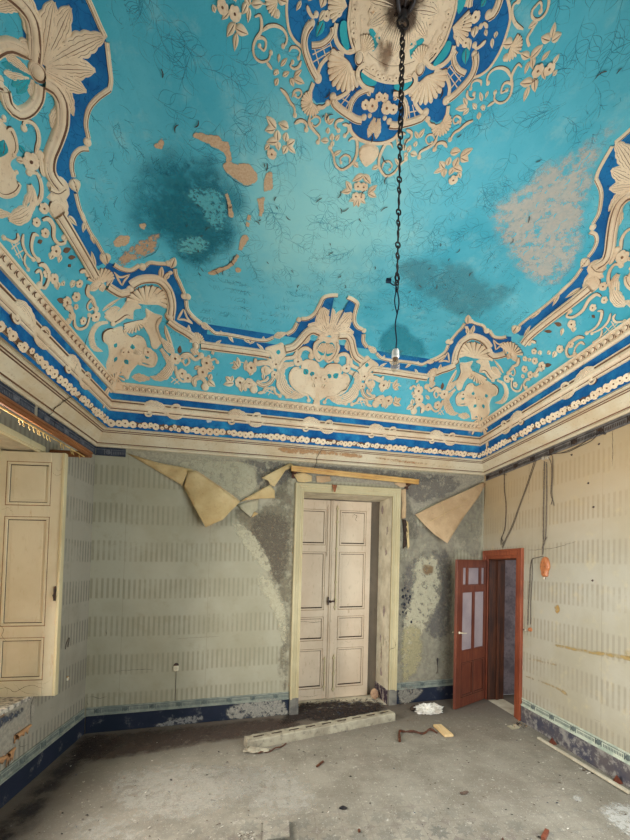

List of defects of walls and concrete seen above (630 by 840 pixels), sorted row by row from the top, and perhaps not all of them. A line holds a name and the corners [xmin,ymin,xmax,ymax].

peeling [114,223,160,267]
water stain [135,160,240,261]
peeling [193,120,278,276]
flaking render [130,448,484,539]
flaking render [0,696,36,757]